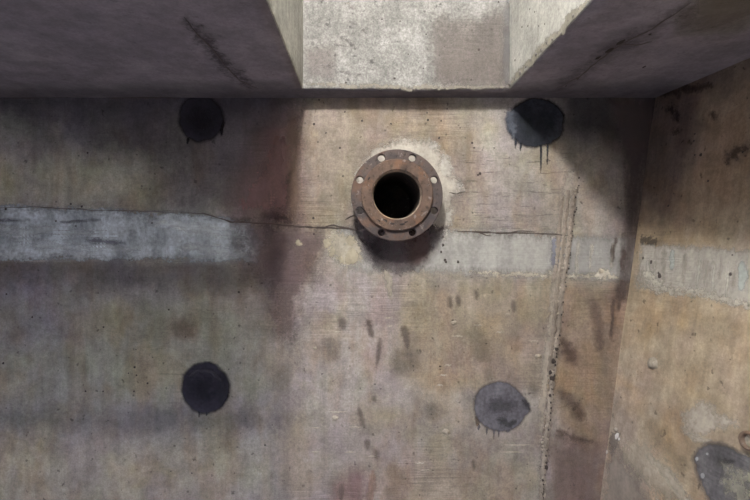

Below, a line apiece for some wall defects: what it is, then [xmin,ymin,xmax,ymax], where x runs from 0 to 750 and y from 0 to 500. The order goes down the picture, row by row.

crack [184,17,258,89]
crack [2,206,355,230]
leakage [334,219,557,296]
crack [454,229,568,237]